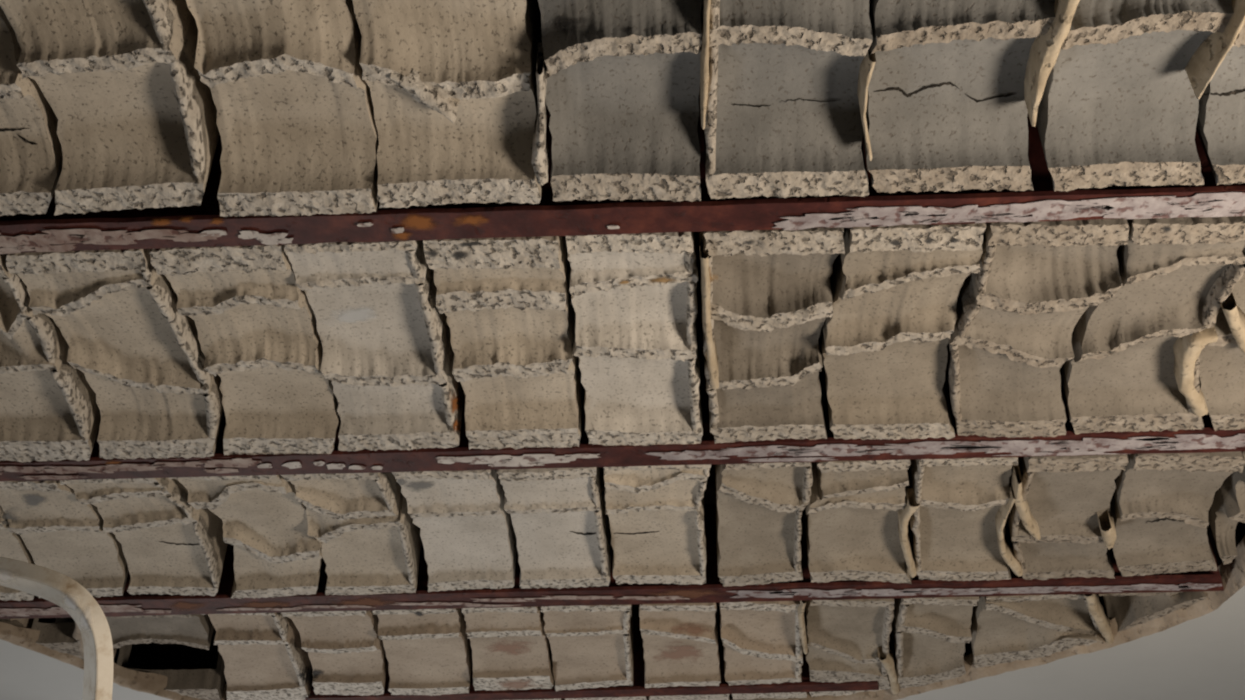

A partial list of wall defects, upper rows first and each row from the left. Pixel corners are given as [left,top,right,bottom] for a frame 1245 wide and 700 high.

crack [874,82,1017,103]
crack [1204,88,1245,96]
crack [0,128,37,145]
corrosion [153,217,192,225]
corrosion [395,215,432,240]
corrosion [457,216,486,225]
peeling [771,192,1245,246]
peeling [0,229,293,254]
peeling [645,434,1245,462]
peeling [0,458,383,480]
peeling [435,453,600,467]
flaking render [726,536,1245,700]